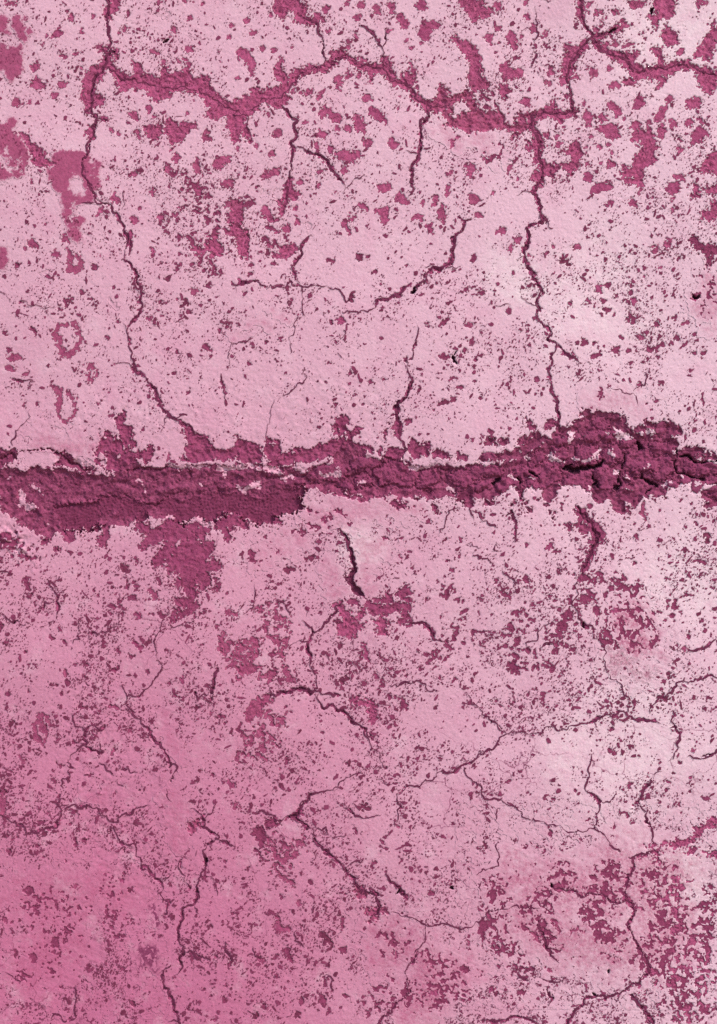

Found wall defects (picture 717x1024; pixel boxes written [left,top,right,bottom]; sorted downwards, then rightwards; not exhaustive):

crack [81,0,472,438]
peeling [0,0,717,282]
crack [496,0,717,429]
crack [11,378,33,445]
crack [5,581,117,643]
crack [0,619,258,1024]
peeling [215,594,300,769]
spalling [0,382,717,684]
peeling [332,582,415,726]
crack [388,325,419,463]
crack [248,478,717,1024]
peeling [342,816,717,1024]